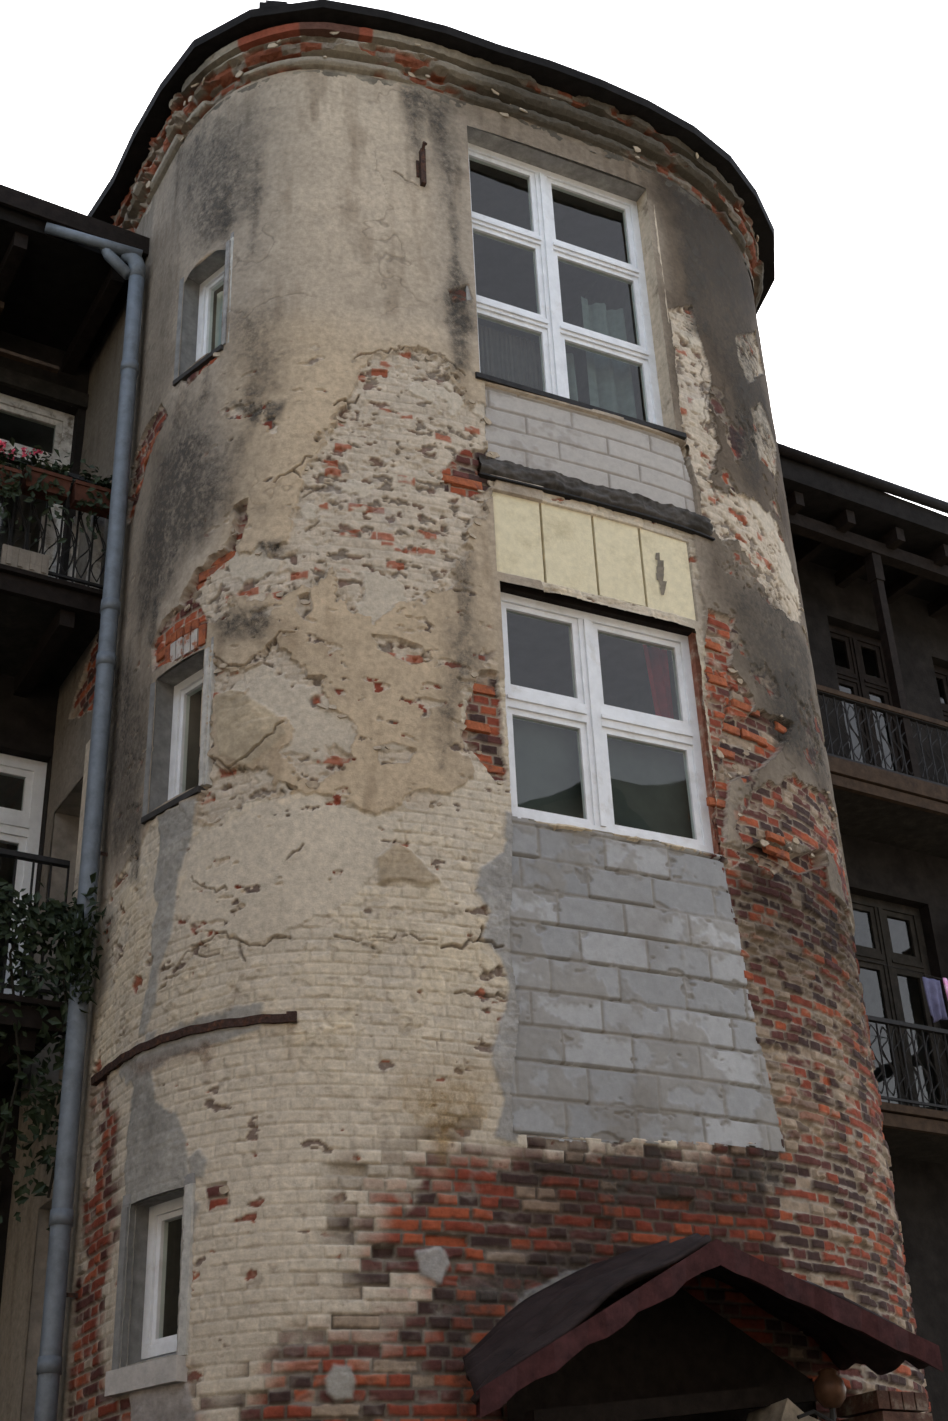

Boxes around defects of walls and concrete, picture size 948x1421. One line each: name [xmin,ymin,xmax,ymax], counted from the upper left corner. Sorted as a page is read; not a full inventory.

damp [243,320,282,421]
damp [450,257,468,366]
spalling [126,402,168,525]
flaking render [668,304,806,634]
damp [140,419,231,644]
flaking render [151,345,500,829]
spalling [457,668,509,785]
flaking render [703,607,840,876]
spalling [204,1180,231,1213]